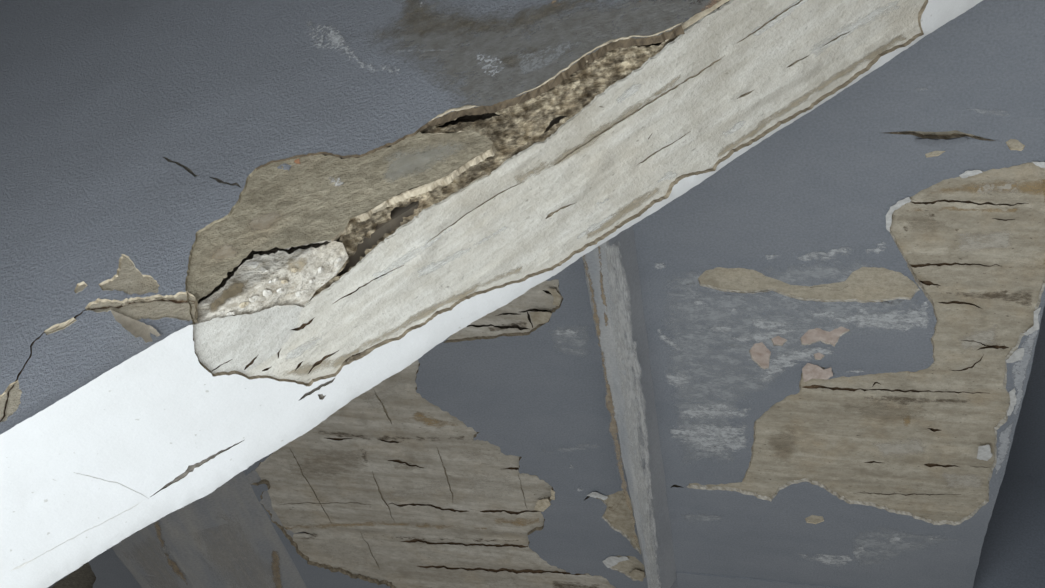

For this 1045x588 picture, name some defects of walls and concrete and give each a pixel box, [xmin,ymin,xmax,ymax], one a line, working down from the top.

damp [308,21,400,74]
damp [380,0,718,107]
crack [163,157,241,188]
spalling [74,0,928,400]
crack [884,130,1001,147]
peeling [0,380,22,422]
crack [0,298,195,422]
damp [658,247,929,460]
spalling [687,139,1045,526]
spalling [250,360,646,588]